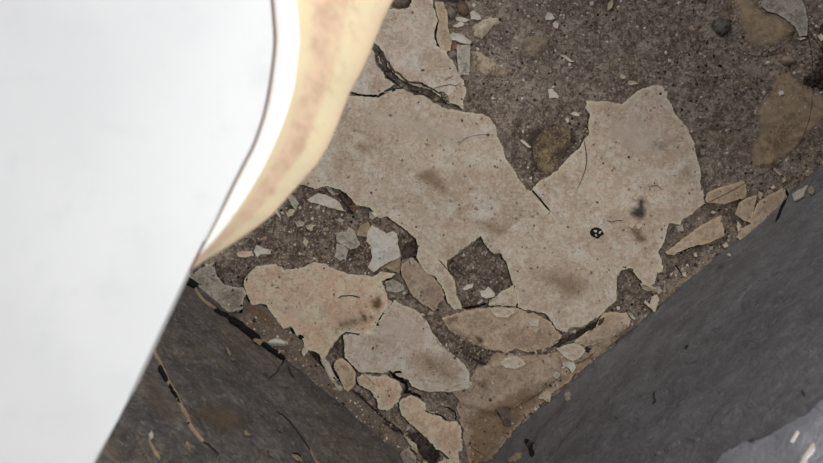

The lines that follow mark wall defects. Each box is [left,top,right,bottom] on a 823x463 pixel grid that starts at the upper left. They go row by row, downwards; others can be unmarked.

peeling [760,0,808,40]
crack [350,88,403,97]
spalling [511,89,589,187]
crack [153,350,220,463]
crack [186,277,294,378]
spalling [214,190,417,292]
spalling [320,334,345,392]
crack [290,327,404,435]
spalling [419,311,497,368]
spalling [448,238,514,317]
peeling [553,342,586,379]
spalling [616,268,662,320]